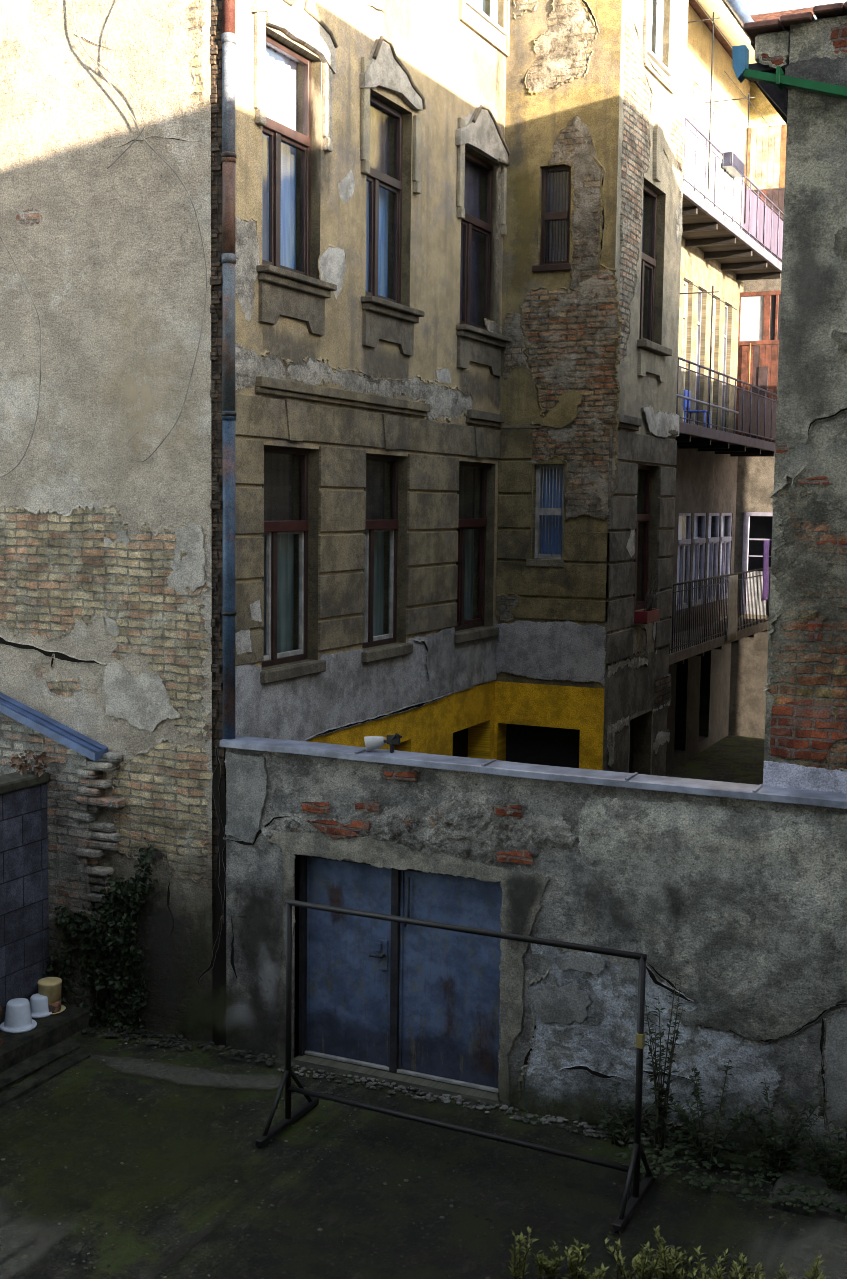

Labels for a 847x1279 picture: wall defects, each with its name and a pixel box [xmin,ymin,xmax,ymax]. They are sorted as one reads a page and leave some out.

flaking render [235,214,261,324]
flaking render [318,243,347,302]
flaking render [484,0,651,523]
flaking render [235,341,474,423]
crack [791,405,847,519]
crack [0,635,106,668]
crack [196,744,290,992]
flaking render [0,503,783,1128]
crack [521,976,539,1087]
crack [560,1065,698,1083]
crack [646,961,847,1128]
flaking render [822,1007,847,1131]